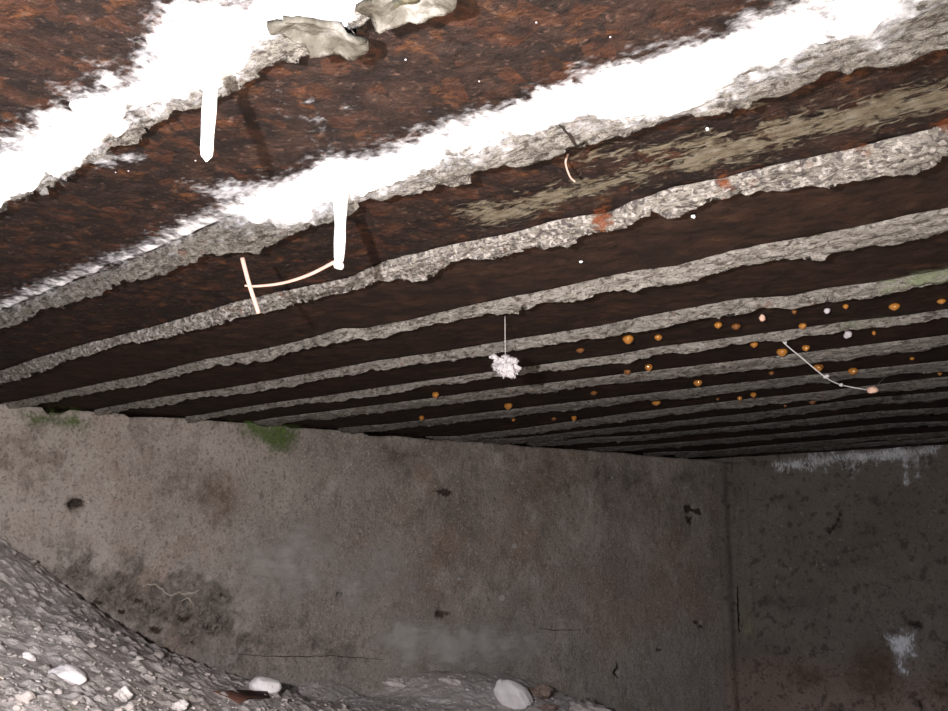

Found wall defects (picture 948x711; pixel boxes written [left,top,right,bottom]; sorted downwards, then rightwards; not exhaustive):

leakage [0,0,901,310]
peeling [455,79,948,227]
corrosion [592,206,613,232]
leakage [776,446,937,484]
leakage [890,633,915,673]